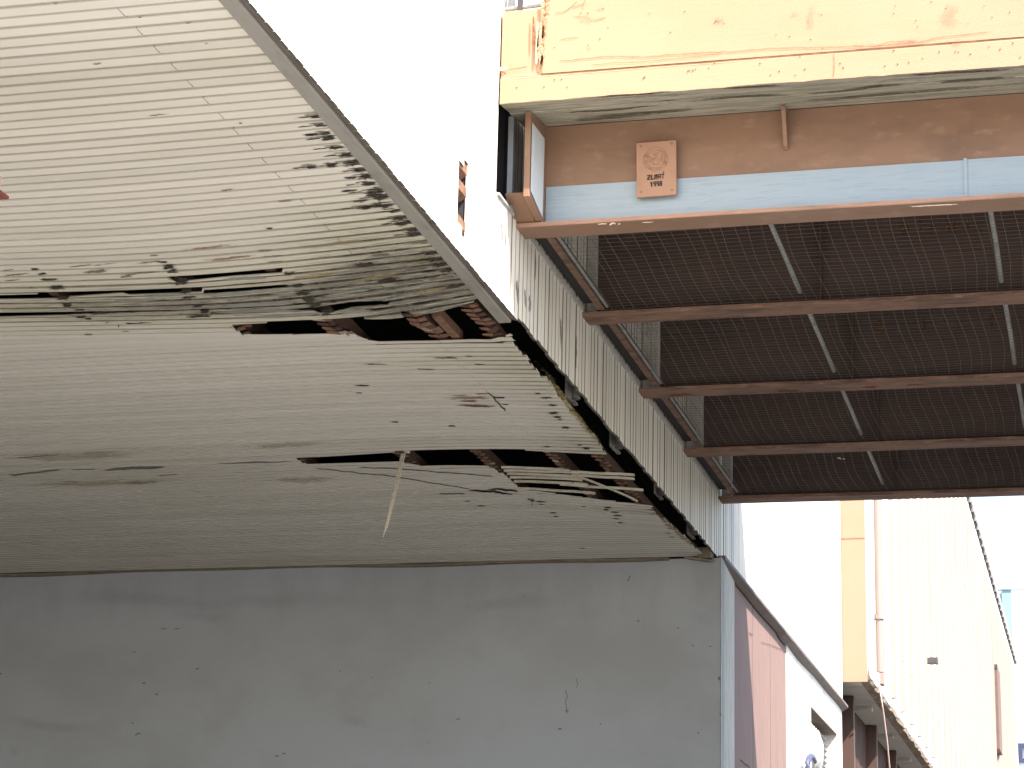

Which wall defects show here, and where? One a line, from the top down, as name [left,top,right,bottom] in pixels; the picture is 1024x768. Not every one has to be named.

water stain [560,69,1021,122]
water stain [292,114,463,293]
peeling [205,276,322,328]